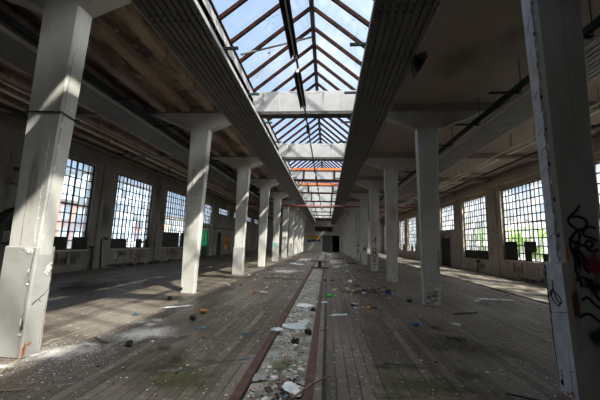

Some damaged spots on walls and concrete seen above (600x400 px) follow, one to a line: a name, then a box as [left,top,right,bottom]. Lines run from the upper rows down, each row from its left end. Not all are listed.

crack [17,52,75,356]
spalling [530,0,561,260]